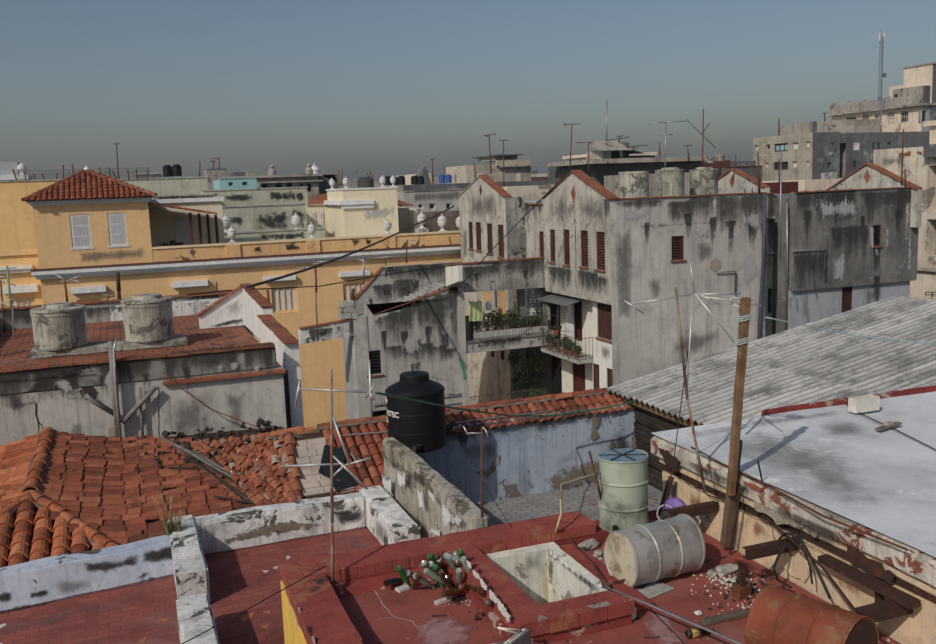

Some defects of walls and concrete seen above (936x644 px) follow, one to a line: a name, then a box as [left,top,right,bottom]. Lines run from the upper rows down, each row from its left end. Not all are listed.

water stain [622,195,777,246]
peeling [816,196,857,218]
water stain [619,238,628,287]
water stain [0,364,84,410]
water stain [96,358,150,389]
peeling [382,470,405,496]
peeling [545,461,598,489]
spalling [659,448,680,473]
peeling [418,490,461,536]
spalling [743,481,819,538]
spalling [847,545,905,583]